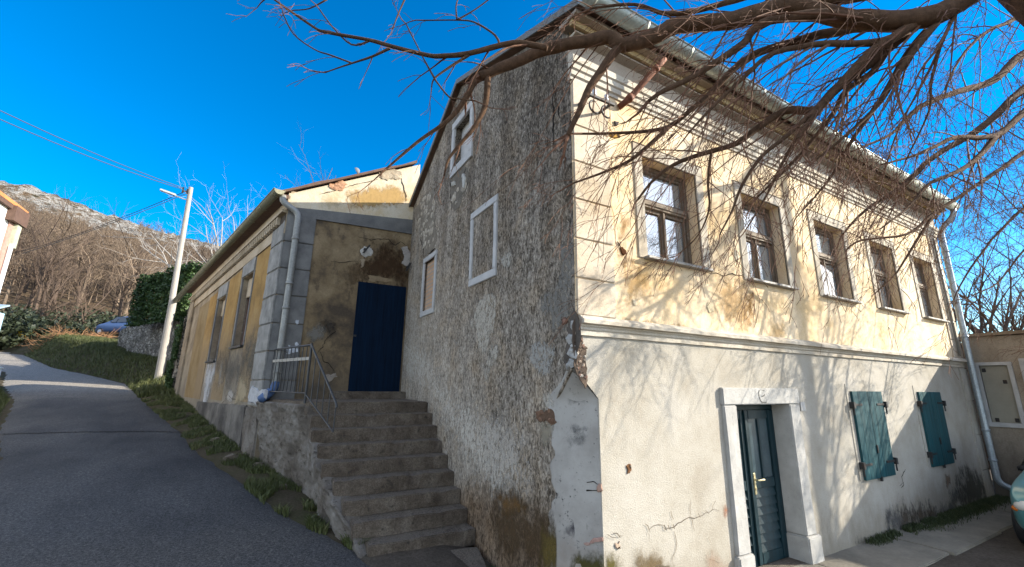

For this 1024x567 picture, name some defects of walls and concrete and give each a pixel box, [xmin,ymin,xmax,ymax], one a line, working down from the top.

spalling [329,169,437,266]
peeling [360,246,392,283]
spalling [530,243,588,389]
spalling [535,393,557,445]
crack [646,501,720,567]